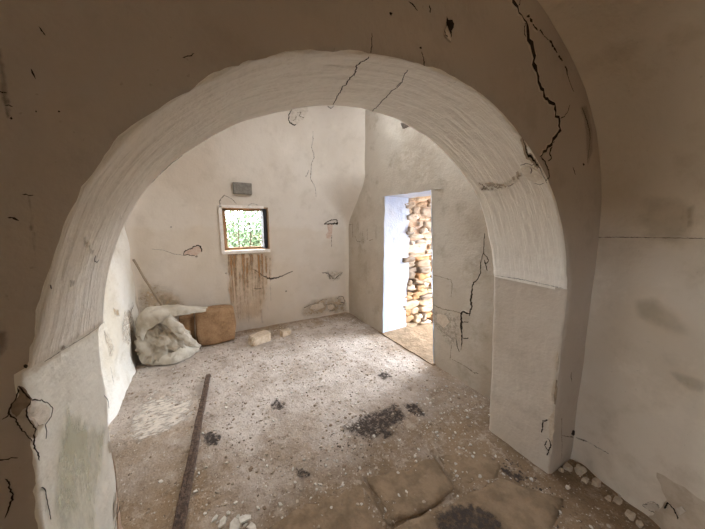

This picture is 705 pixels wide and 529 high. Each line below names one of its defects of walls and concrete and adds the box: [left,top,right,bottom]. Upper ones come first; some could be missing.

peeling [288,107,308,126]
crack [328,38,372,109]
crack [511,0,591,183]
peeling [167,245,202,257]
crack [254,270,293,289]
crack [436,233,558,351]
flaking render [3,386,53,459]
crack [5,479,14,517]